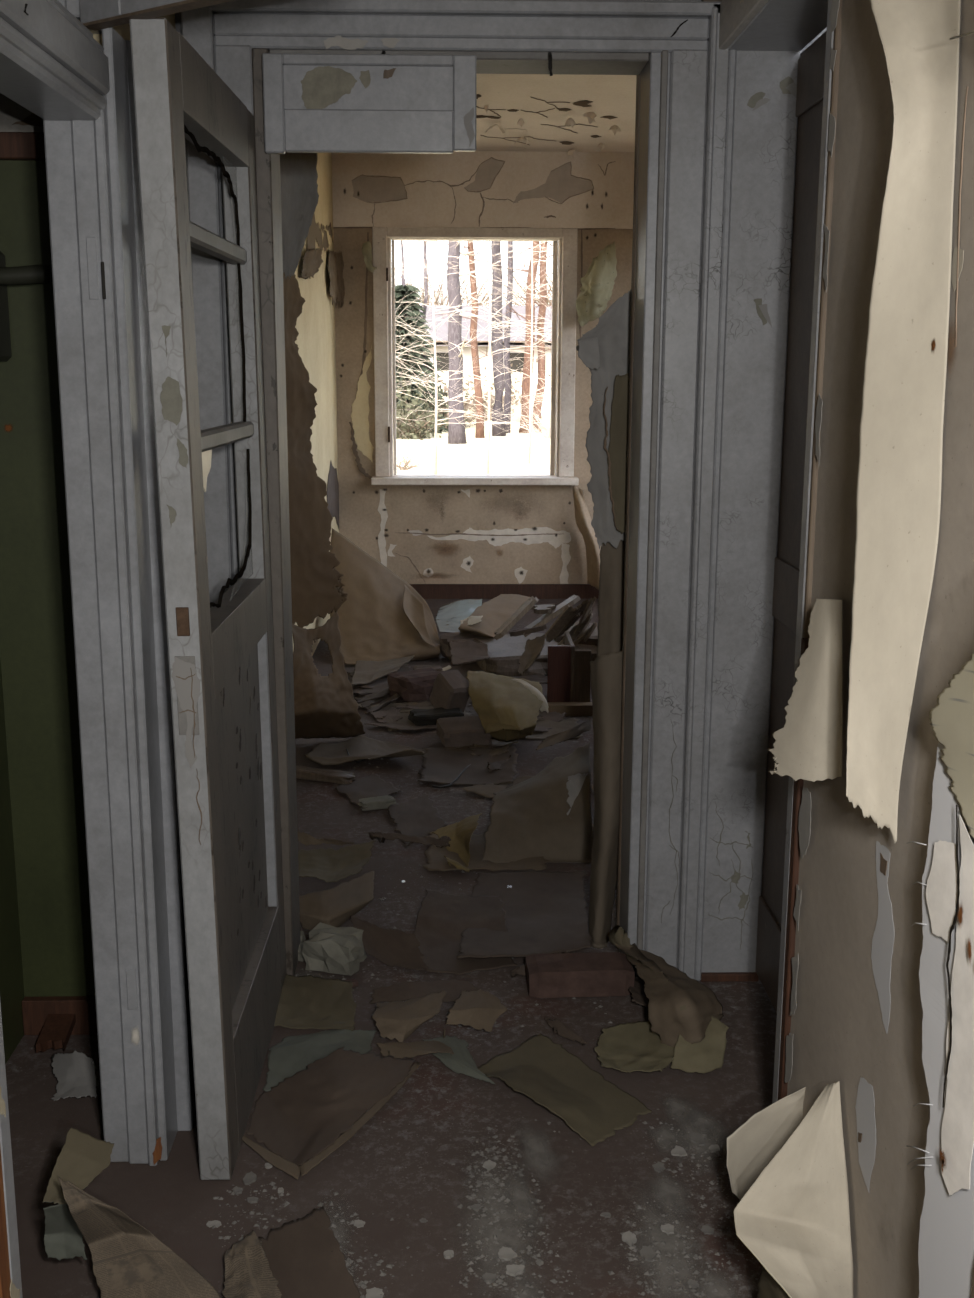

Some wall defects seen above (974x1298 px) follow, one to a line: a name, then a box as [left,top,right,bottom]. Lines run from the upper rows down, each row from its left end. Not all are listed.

peeling [324,36,400,50]
peeling [301,66,396,109]
peeling [464,94,525,147]
peeling [514,100,621,204]
peeling [352,174,408,203]
crack [405,97,615,293]
peeling [327,461,339,528]
peeling [378,489,396,567]
peeling [408,527,571,584]
peeling [798,786,811,858]
peeling [785,1033,793,1083]
peeling [855,1078,876,1192]